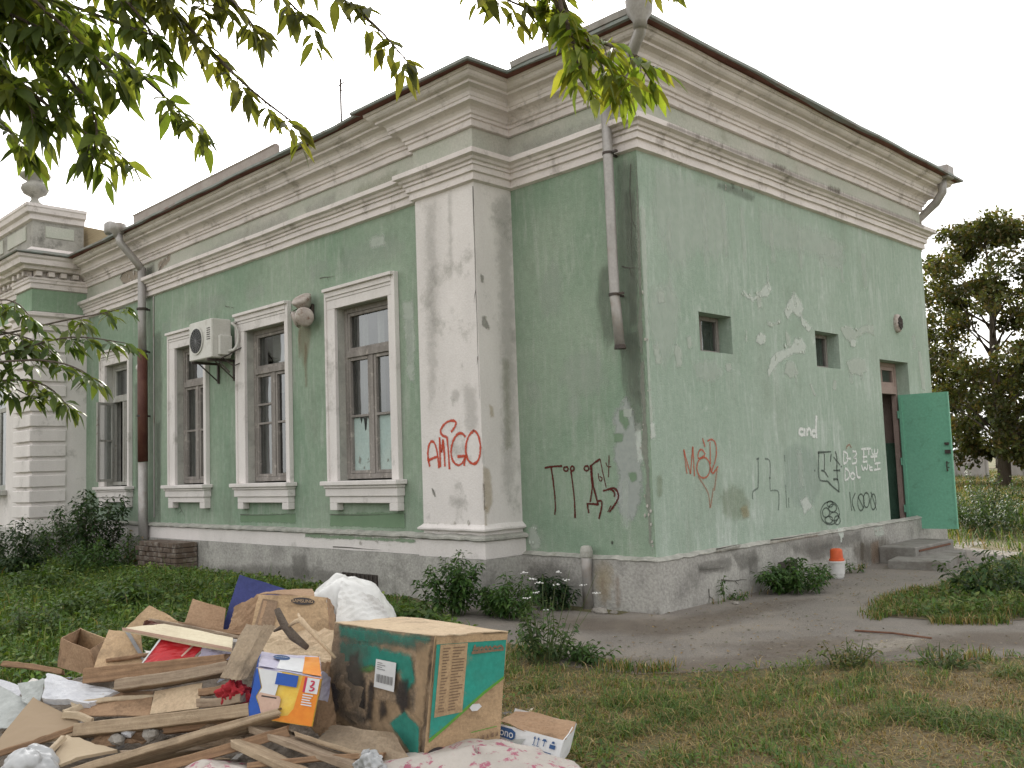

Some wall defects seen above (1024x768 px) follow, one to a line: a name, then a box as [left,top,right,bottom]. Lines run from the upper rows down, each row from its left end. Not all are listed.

peeling [613,184,664,547]
peeling [746,293,811,377]